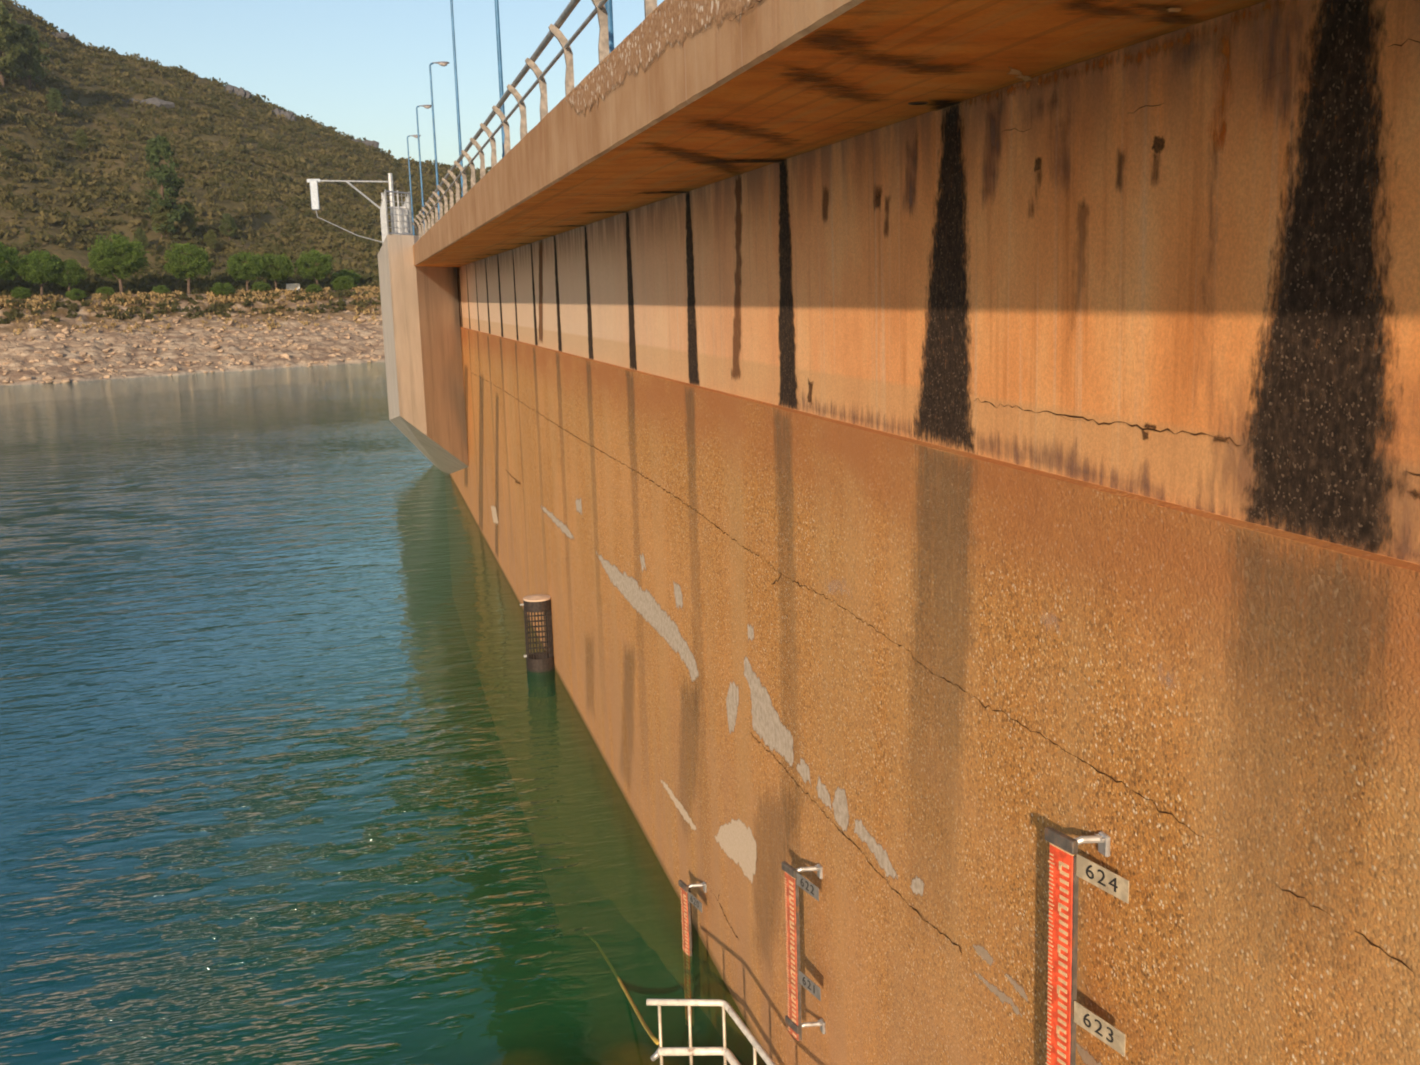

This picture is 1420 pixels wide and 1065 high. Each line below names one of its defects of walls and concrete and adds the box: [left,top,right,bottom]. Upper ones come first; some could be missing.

leakage [809,31,973,75]
leakage [639,122,798,409]
leakage [874,188,889,235]
leakage [914,100,1163,527]
leakage [1246,0,1404,556]
peeling [541,506,573,539]
peeling [596,552,699,682]
crack [474,374,1241,837]
peeling [661,780,697,830]
peeling [715,819,757,883]
peeling [726,624,924,896]
crack [1278,886,1414,973]